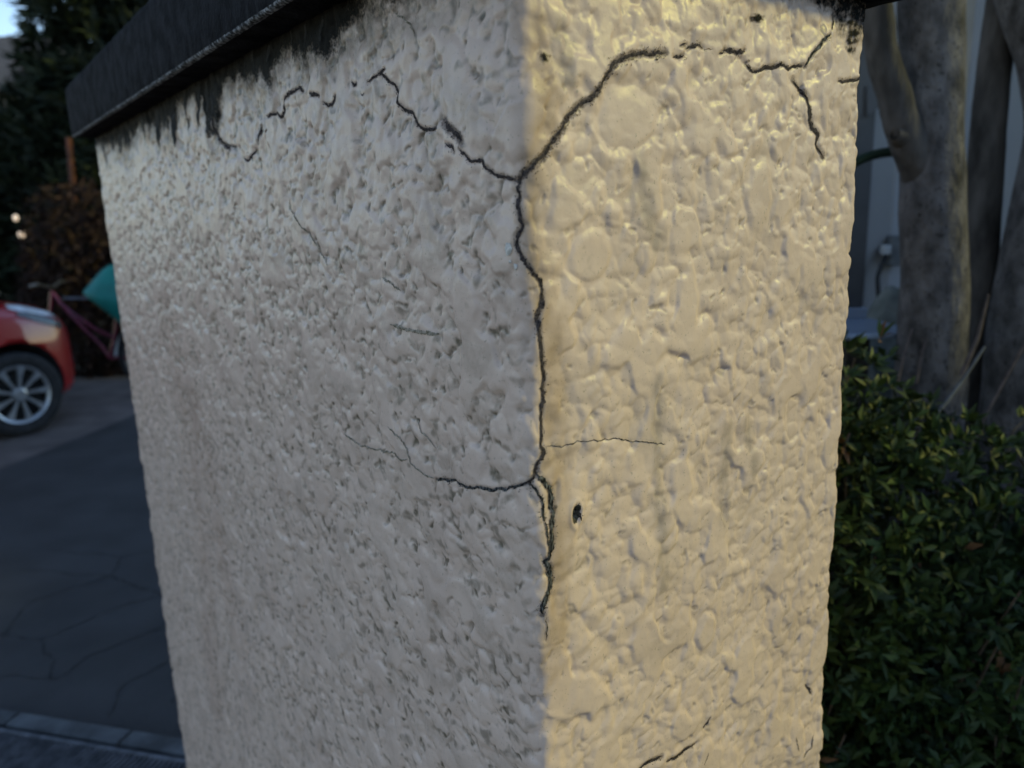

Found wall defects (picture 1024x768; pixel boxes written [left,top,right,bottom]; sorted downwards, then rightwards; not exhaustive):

damp [95,0,395,168]
crack [839,76,860,84]
crack [210,13,834,639]